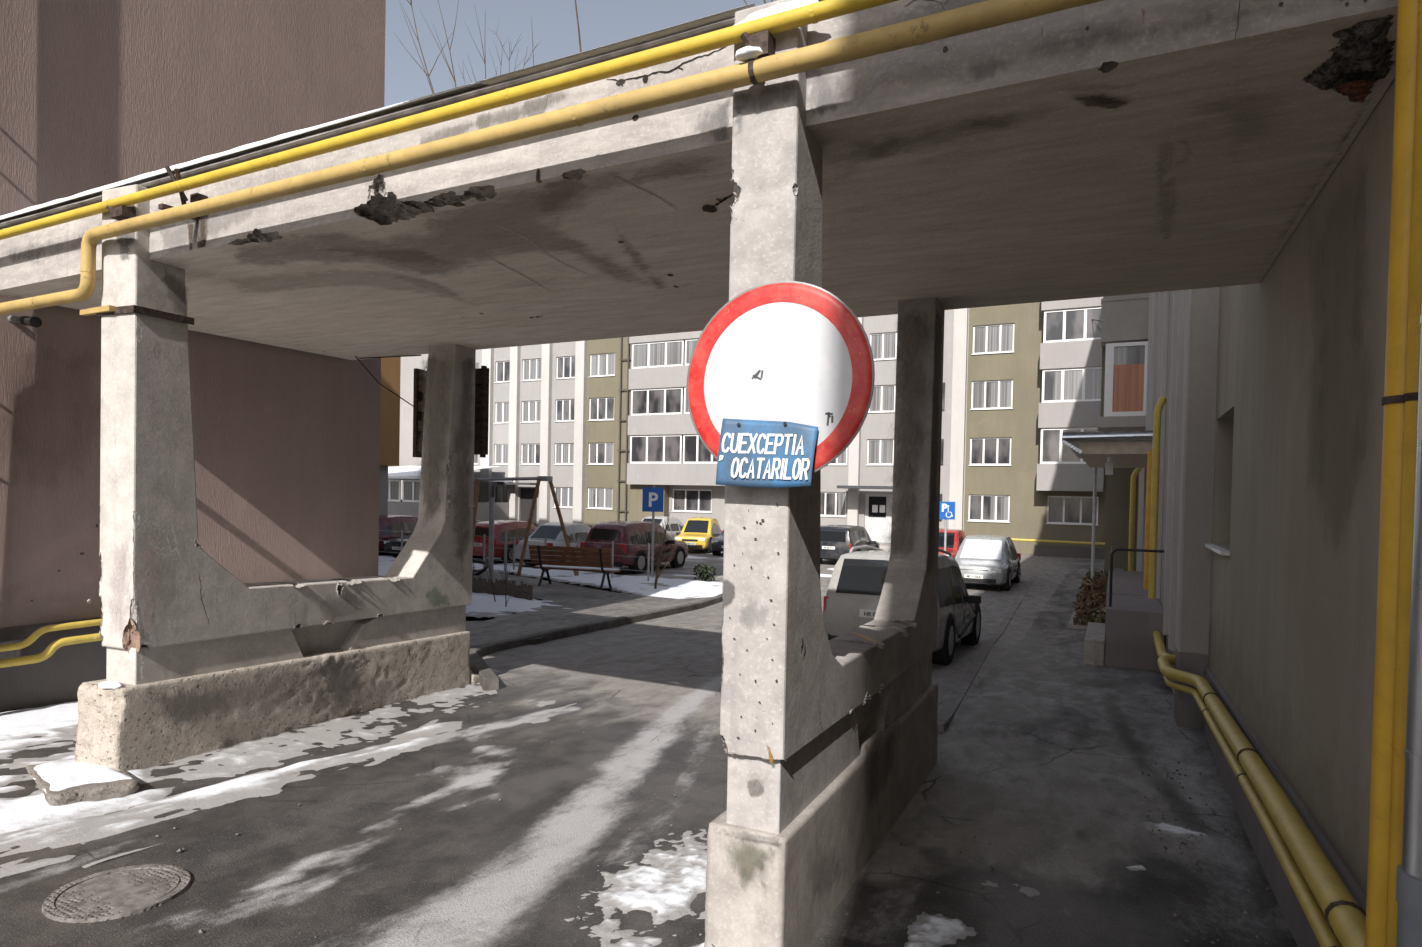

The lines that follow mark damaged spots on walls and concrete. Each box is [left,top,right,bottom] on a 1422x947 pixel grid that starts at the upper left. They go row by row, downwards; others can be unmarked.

peeling [1303,15,1395,103]
leakage [1075,95,1126,109]
spalling [353,174,497,225]
spalling [730,166,742,225]
spalling [87,552,104,647]
spalling [122,598,150,652]
leakage [159,663,354,723]